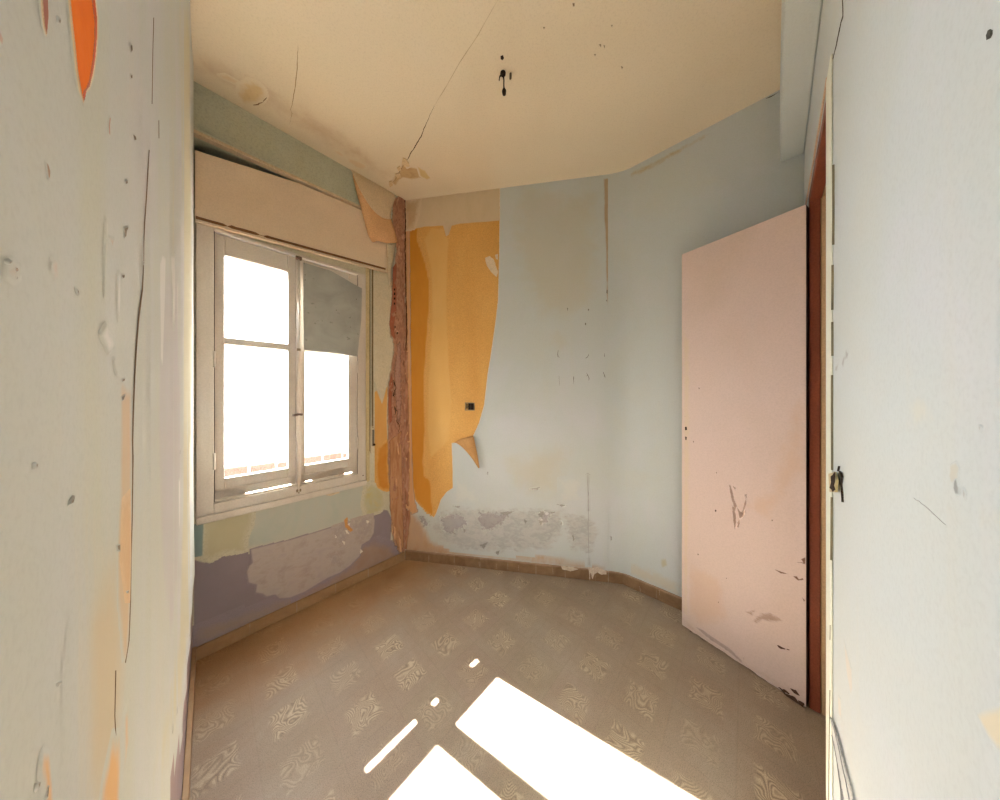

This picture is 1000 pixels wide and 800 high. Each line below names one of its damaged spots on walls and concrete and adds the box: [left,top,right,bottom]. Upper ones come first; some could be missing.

peeling [371,157,500,553]